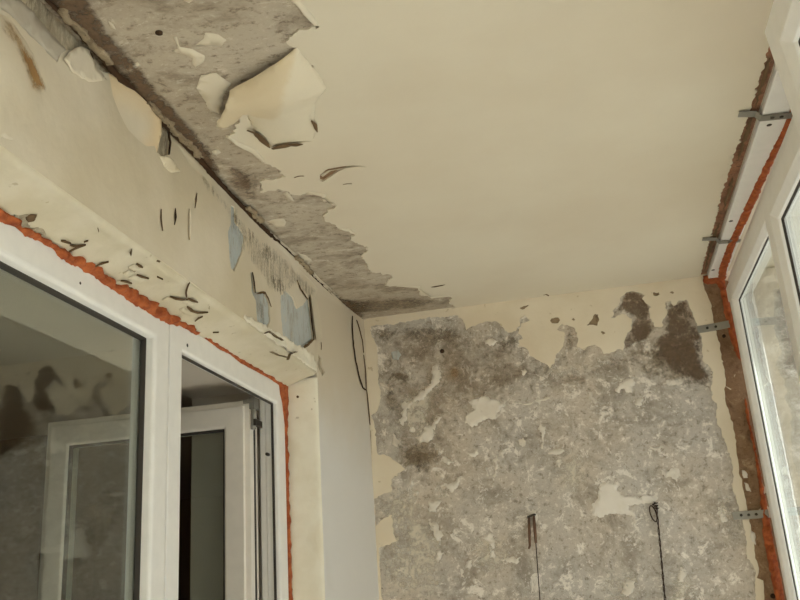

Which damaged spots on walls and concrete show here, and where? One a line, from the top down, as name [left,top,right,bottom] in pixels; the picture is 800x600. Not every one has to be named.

peeling [0,0,455,319]
flaking render [701,47,774,275]
peeling [370,291,776,600]
water stain [619,293,707,383]
flaking render [703,280,732,323]
flaking render [770,518,787,600]